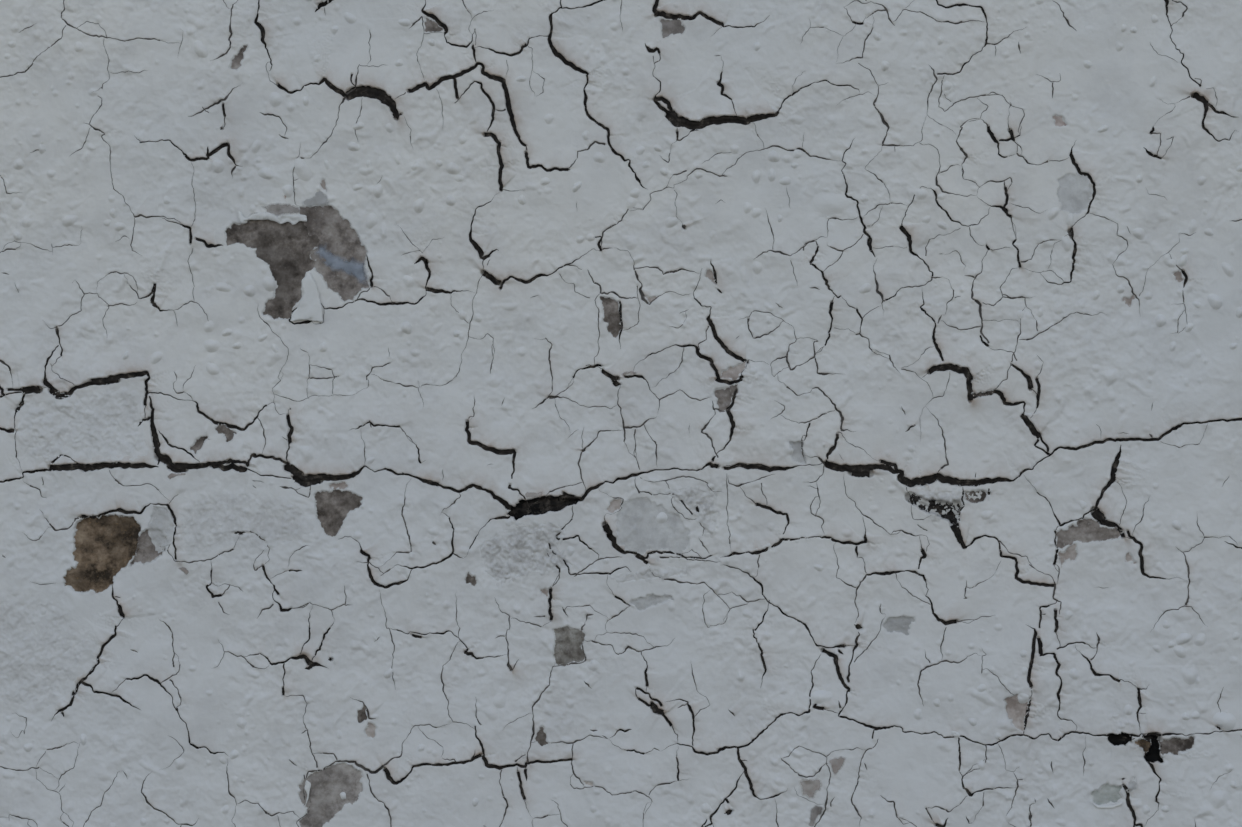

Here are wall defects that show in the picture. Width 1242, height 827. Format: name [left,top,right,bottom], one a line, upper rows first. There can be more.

peeling [224,179,370,322]
crack [0,0,1242,589]
crack [22,495,241,615]
flaking render [64,481,362,594]
flaking render [908,485,1006,527]
crack [211,531,348,715]
peeling [553,625,585,667]
crack [0,742,199,827]
crack [51,585,311,827]
peeling [298,762,364,827]
crack [1122,752,1161,827]
flaking render [1108,733,1195,763]